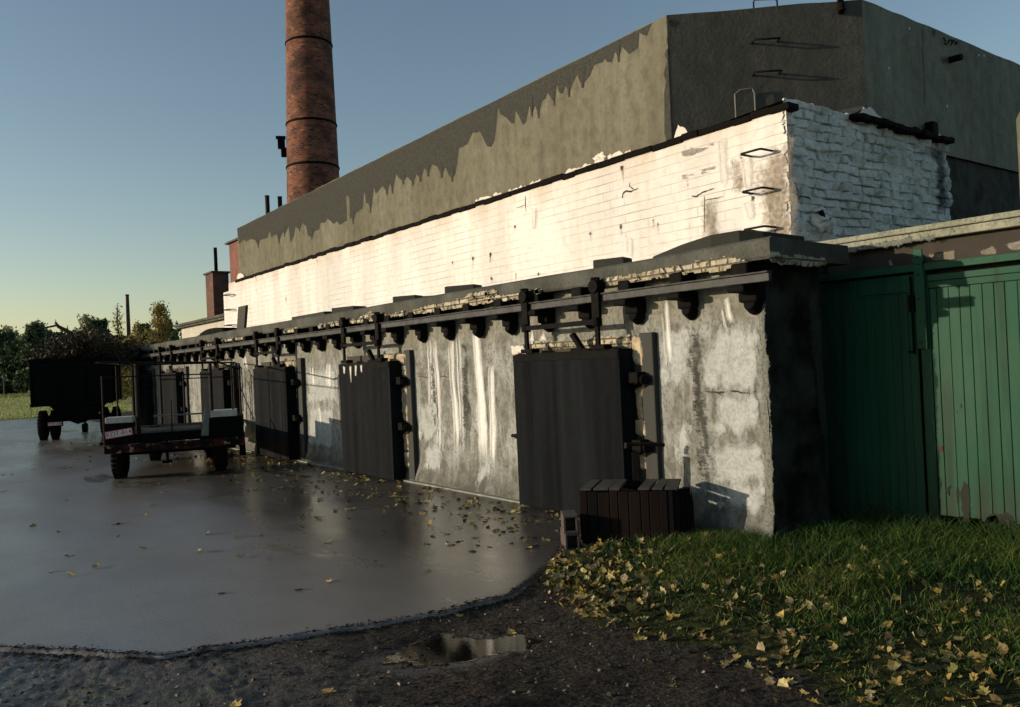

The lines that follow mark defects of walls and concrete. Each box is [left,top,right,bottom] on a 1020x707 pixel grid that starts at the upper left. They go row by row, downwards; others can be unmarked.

peeling [565,150,631,174]
damp [741,158,751,188]
spalling [603,256,747,286]
spalling [770,250,827,267]
damp [427,335,496,461]
damp [687,334,713,493]